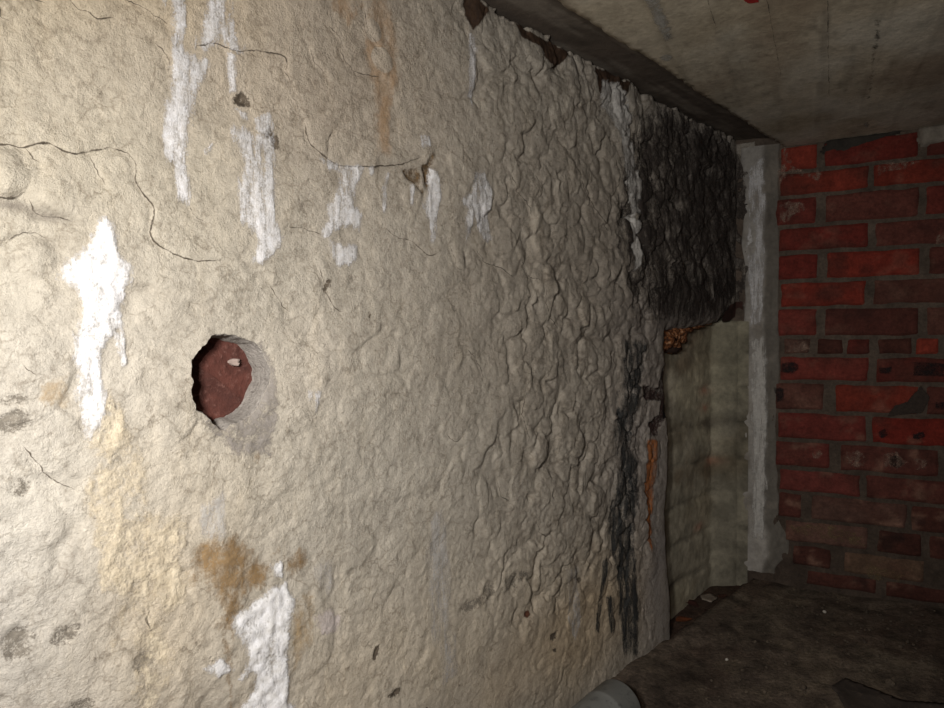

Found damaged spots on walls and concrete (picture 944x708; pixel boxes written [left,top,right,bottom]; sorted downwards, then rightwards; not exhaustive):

crack [72,0,170,72]
leakage [162,0,240,204]
crack [197,43,289,78]
crack [0,141,216,262]
leakage [231,108,281,265]
flaking render [191,337,252,422]
rust [663,323,713,354]
leakage [62,217,188,708]
leakage [596,341,646,655]
rust [644,440,658,550]
rust [198,539,267,624]
leakage [233,562,295,708]